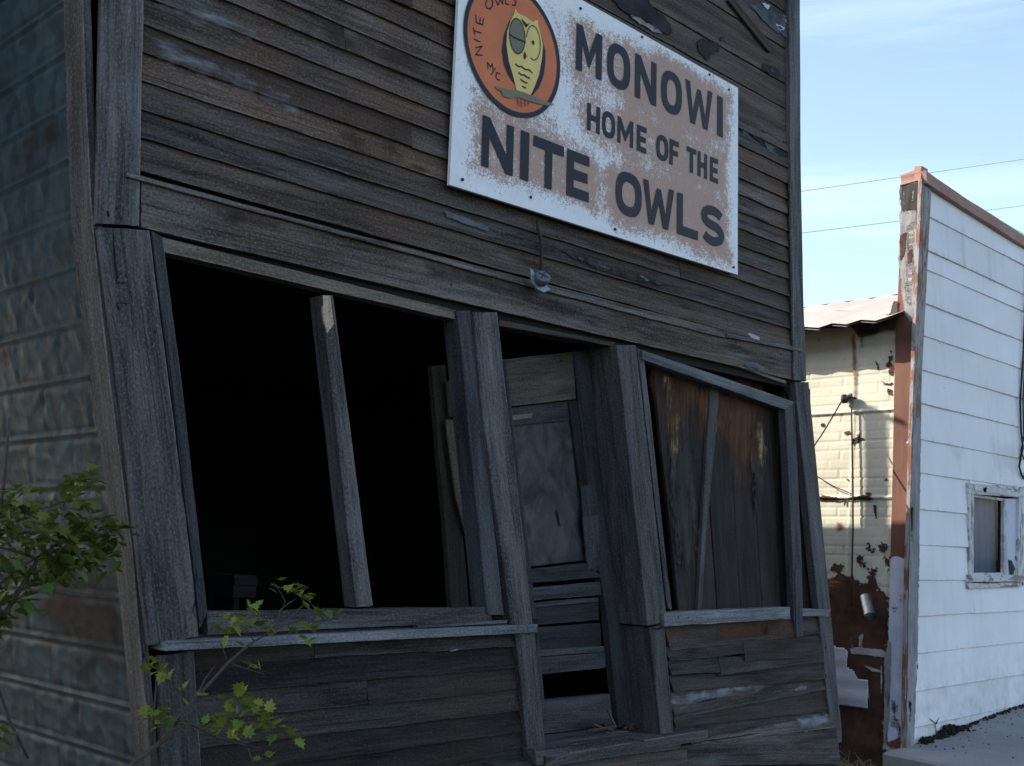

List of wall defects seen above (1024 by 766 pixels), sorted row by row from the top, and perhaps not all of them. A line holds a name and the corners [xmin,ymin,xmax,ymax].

peeling [898,183,918,323]
peeling [850,417,922,748]